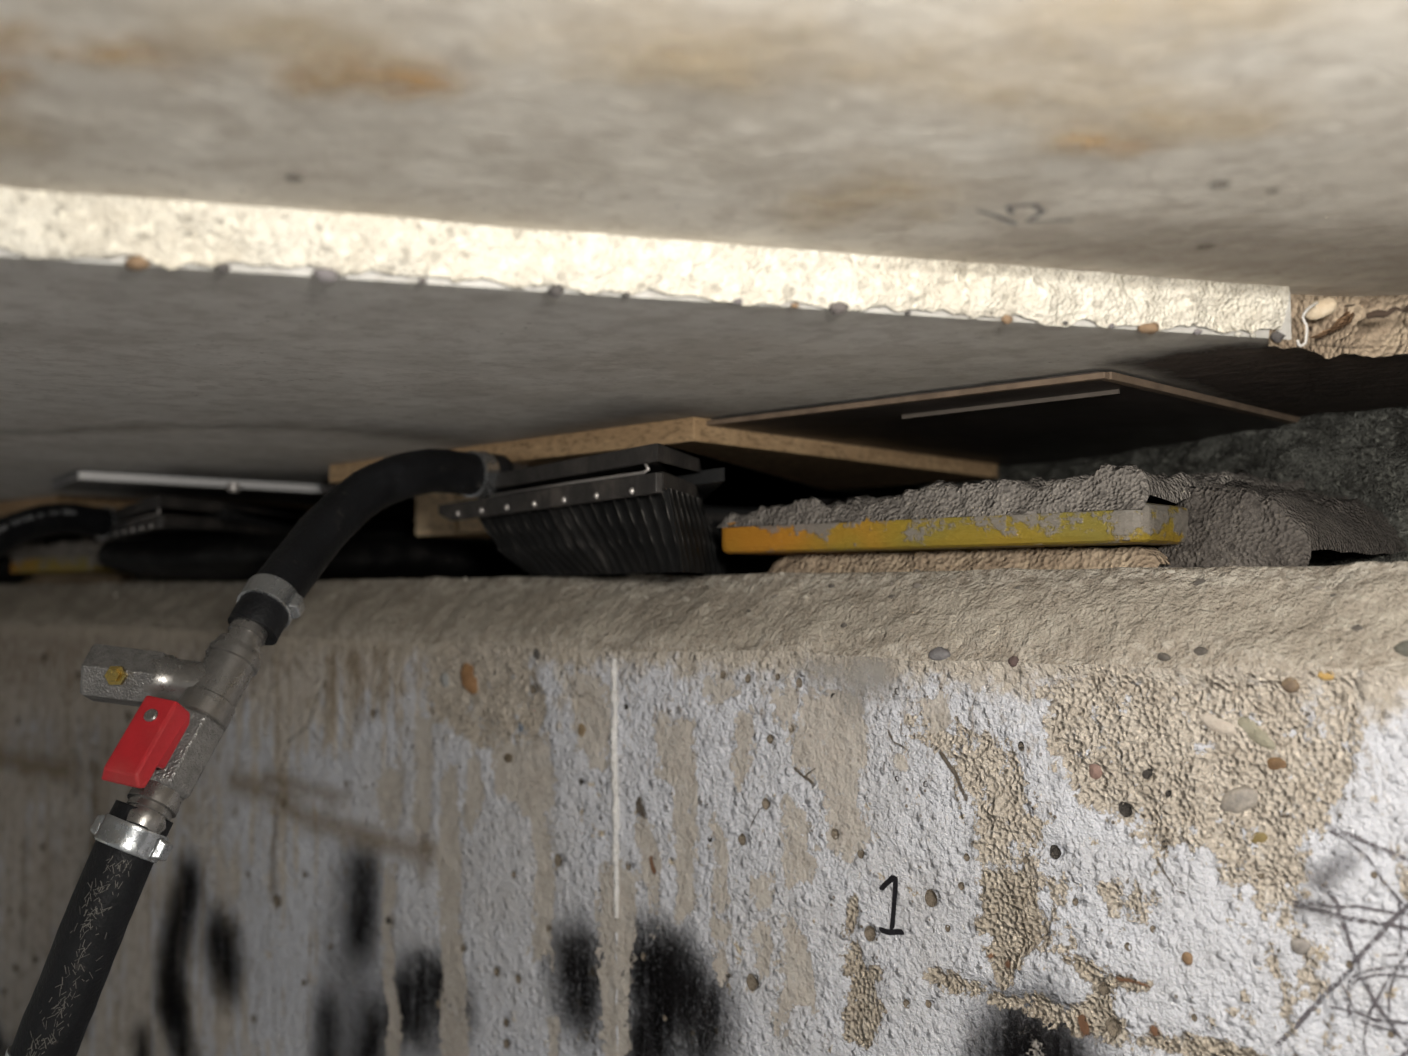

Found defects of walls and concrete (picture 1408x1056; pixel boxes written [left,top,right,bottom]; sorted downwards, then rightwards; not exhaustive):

spalling [1310,308,1355,339]
peeling [573,673,628,785]
flaking render [928,647,951,661]
peeling [378,862,403,1056]
spalling [422,642,563,1056]
peeling [594,674,879,1056]
spalling [839,893,887,1051]
spalling [892,690,1267,1056]
spalling [1034,664,1369,1056]